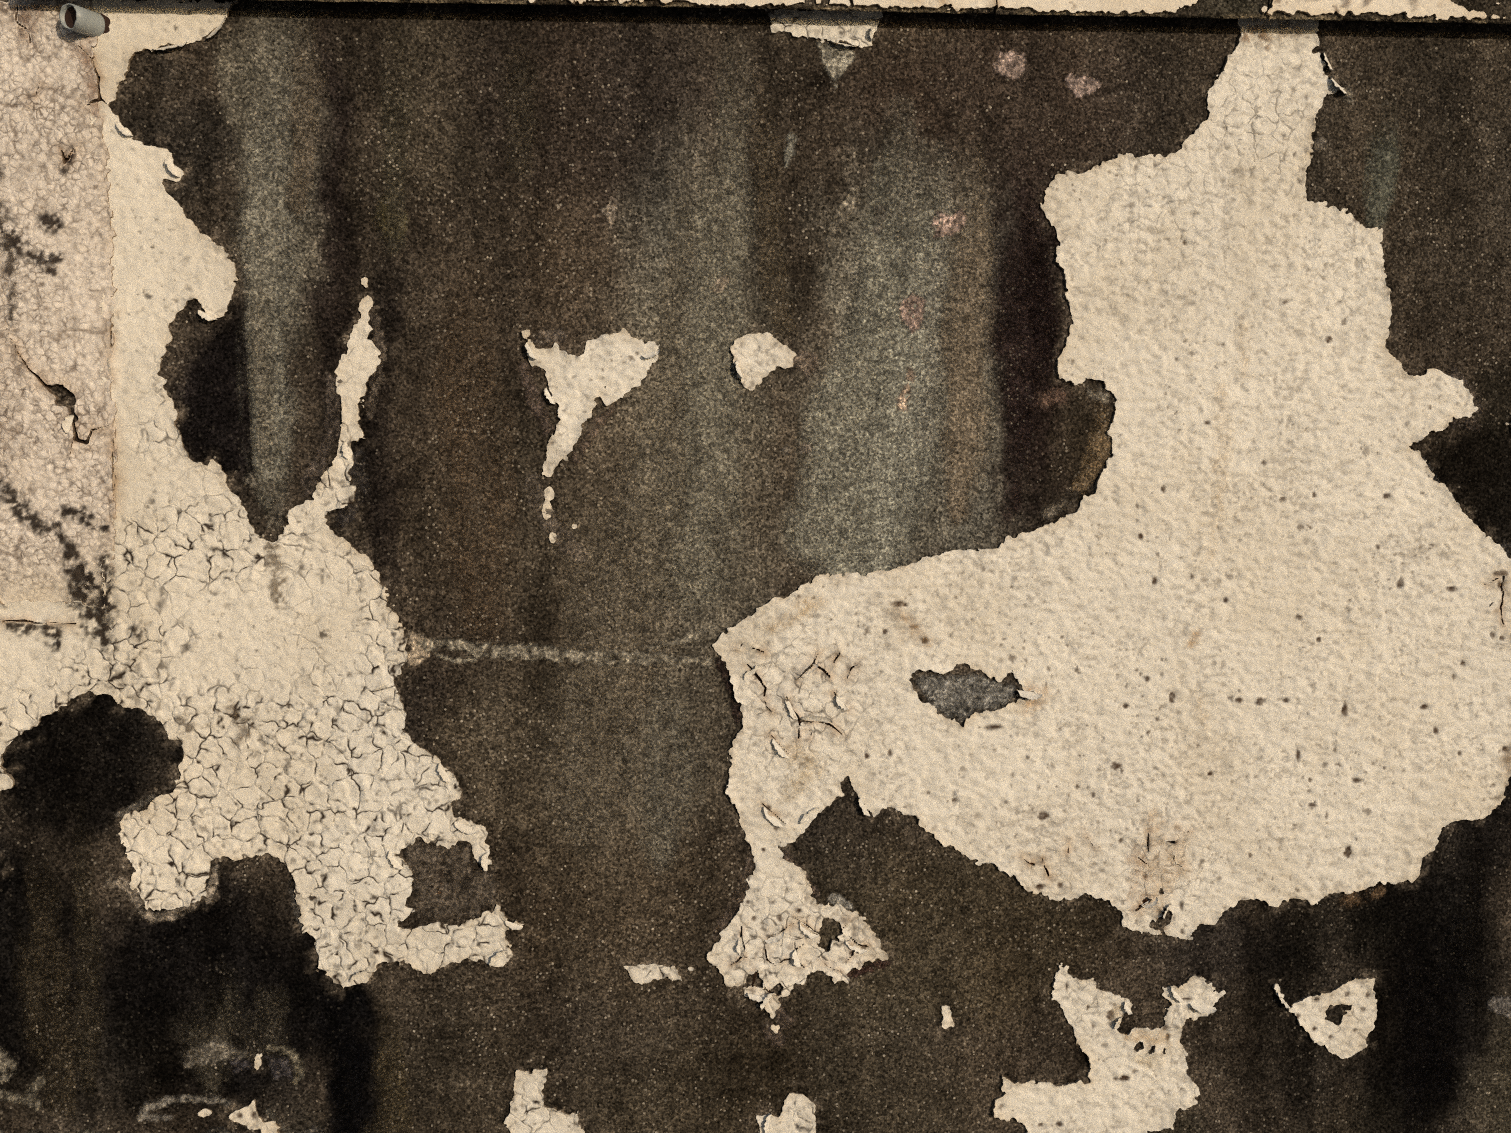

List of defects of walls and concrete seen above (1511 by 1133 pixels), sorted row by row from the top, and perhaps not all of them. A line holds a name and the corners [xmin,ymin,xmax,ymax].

crack [5,617,77,625]
crack [73,419,95,444]
peeling [0,0,524,988]
water stain [264,543,286,603]
peeling [519,328,660,561]
water stain [786,183,1058,577]
peeling [568,0,1511,1059]
crack [416,624,854,750]
water stain [21,854,100,1116]
water stain [189,992,288,1092]
peeling [504,1067,585,1133]
peeling [756,1092,816,1133]